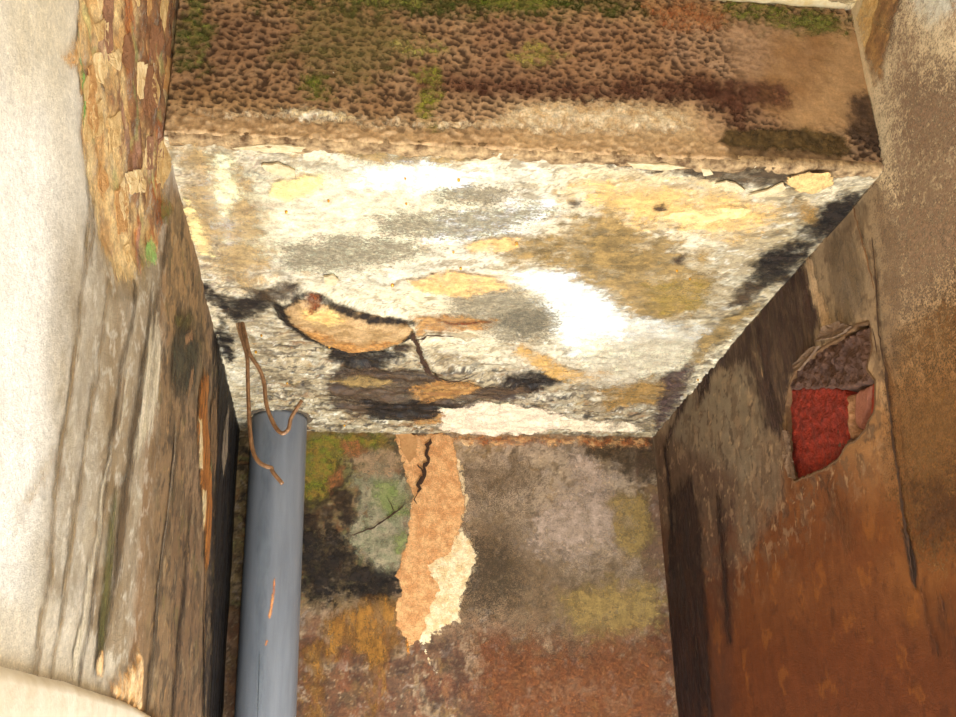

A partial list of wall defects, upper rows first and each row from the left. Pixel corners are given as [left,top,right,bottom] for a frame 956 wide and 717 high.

damp [34,281,110,673]
damp [73,220,172,683]
damp [221,107,409,130]
damp [180,149,581,717]
crack [347,439,432,537]
crack [410,333,471,383]
peeling [409,270,511,299]
peeling [322,362,640,673]
spalling [64,0,899,284]
damp [425,0,956,717]
spalling [782,303,877,483]
crack [853,206,917,588]